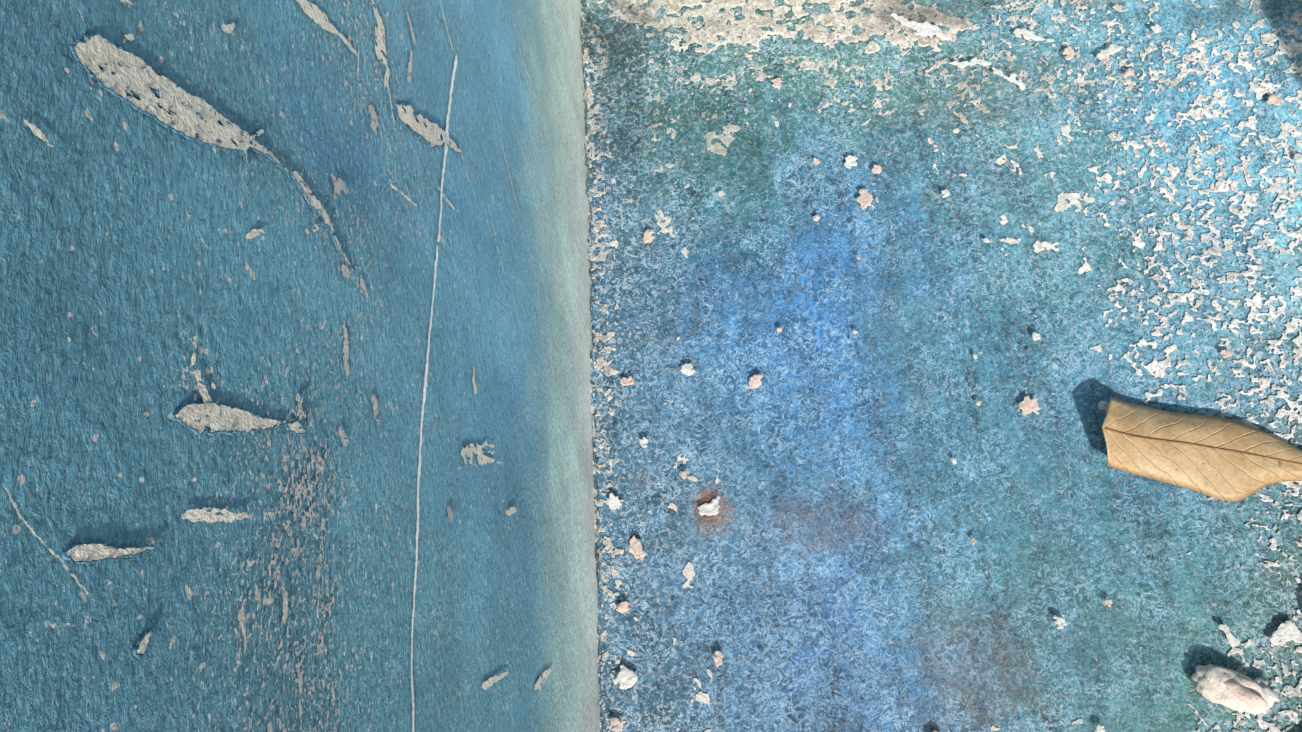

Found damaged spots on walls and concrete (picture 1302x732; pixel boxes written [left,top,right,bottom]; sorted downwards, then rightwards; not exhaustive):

peeling [581,0,1302,447]
peeling [69,0,552,732]
spalling [673,454,698,482]
peeling [590,295,646,732]
spalling [698,477,720,516]
peeling [48,542,157,602]
peeling [682,562,696,588]
spalling [1053,615,1067,629]
peeling [690,650,723,705]
spalling [1065,719,1105,732]